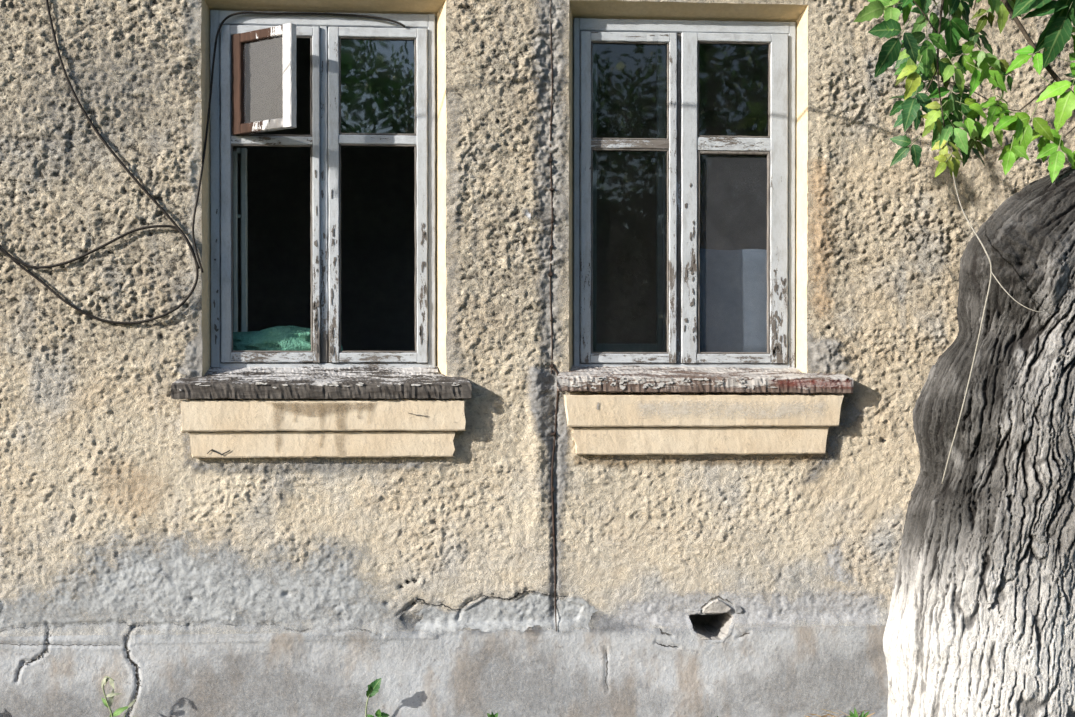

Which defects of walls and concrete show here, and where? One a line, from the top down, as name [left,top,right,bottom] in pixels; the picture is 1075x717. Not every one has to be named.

peeling [314,228,336,276]
peeling [313,284,335,356]
peeling [772,269,786,357]
peeling [572,376,724,390]
water stain [183,435,435,500]
water stain [414,367,881,636]
water stain [0,532,400,649]
crack [398,590,568,615]
spalling [684,596,743,644]
crack [0,621,382,717]
water stain [145,656,369,717]